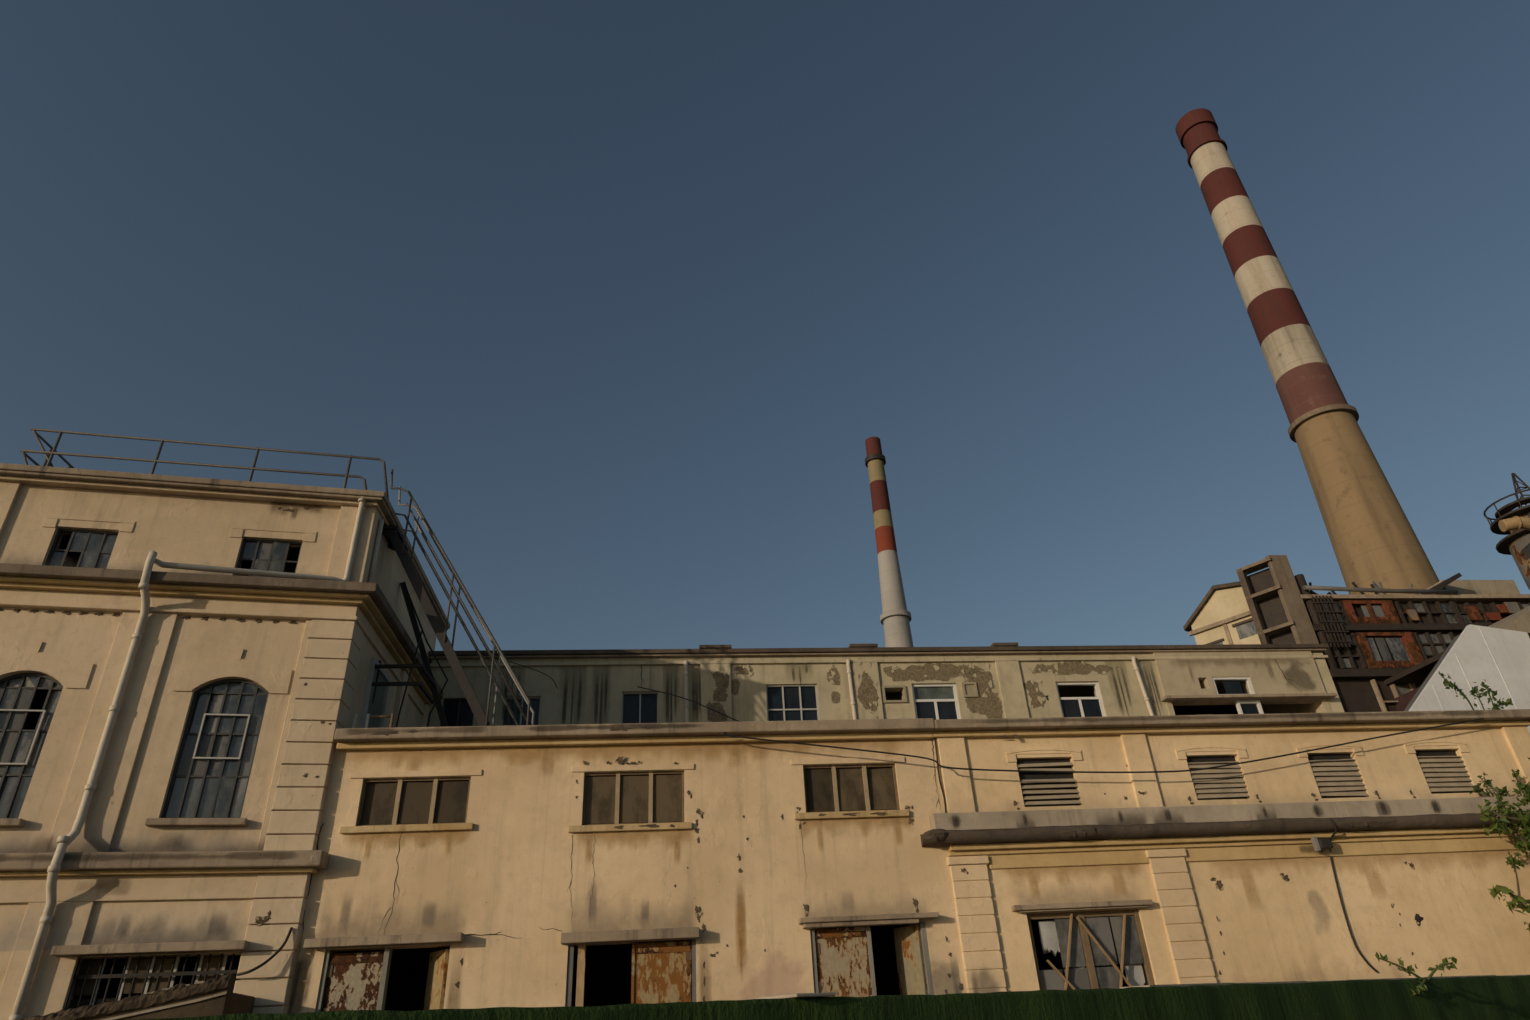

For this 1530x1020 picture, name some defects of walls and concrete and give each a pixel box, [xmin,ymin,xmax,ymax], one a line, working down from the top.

water stain [537,681,701,731]
peeling [706,664,753,722]
peeling [827,662,1018,739]
peeling [1023,661,1113,708]
crack [379,833,402,933]